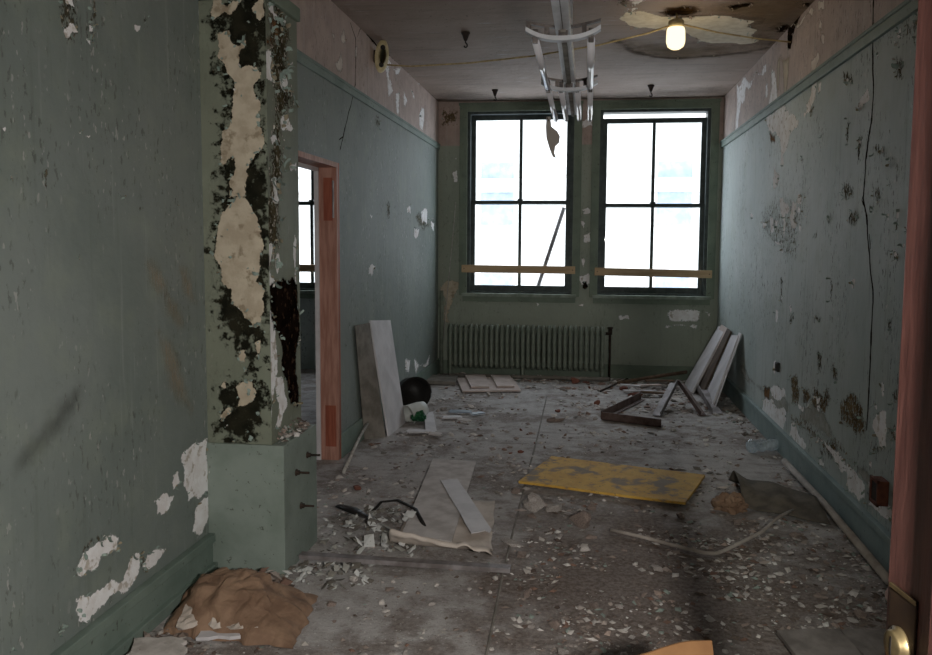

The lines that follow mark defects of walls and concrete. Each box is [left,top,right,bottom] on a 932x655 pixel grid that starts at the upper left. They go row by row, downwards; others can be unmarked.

peeling [210,0,241,20]
peeling [252,0,291,30]
leakage [617,41,721,60]
peeling [619,0,759,44]
peeling [735,65,821,252]
peeling [209,30,304,431]
crack [862,0,874,431]
peeling [665,309,710,329]
peeling [154,438,210,535]
peeling [760,382,898,522]
peeling [74,534,122,577]
peeling [76,546,167,625]